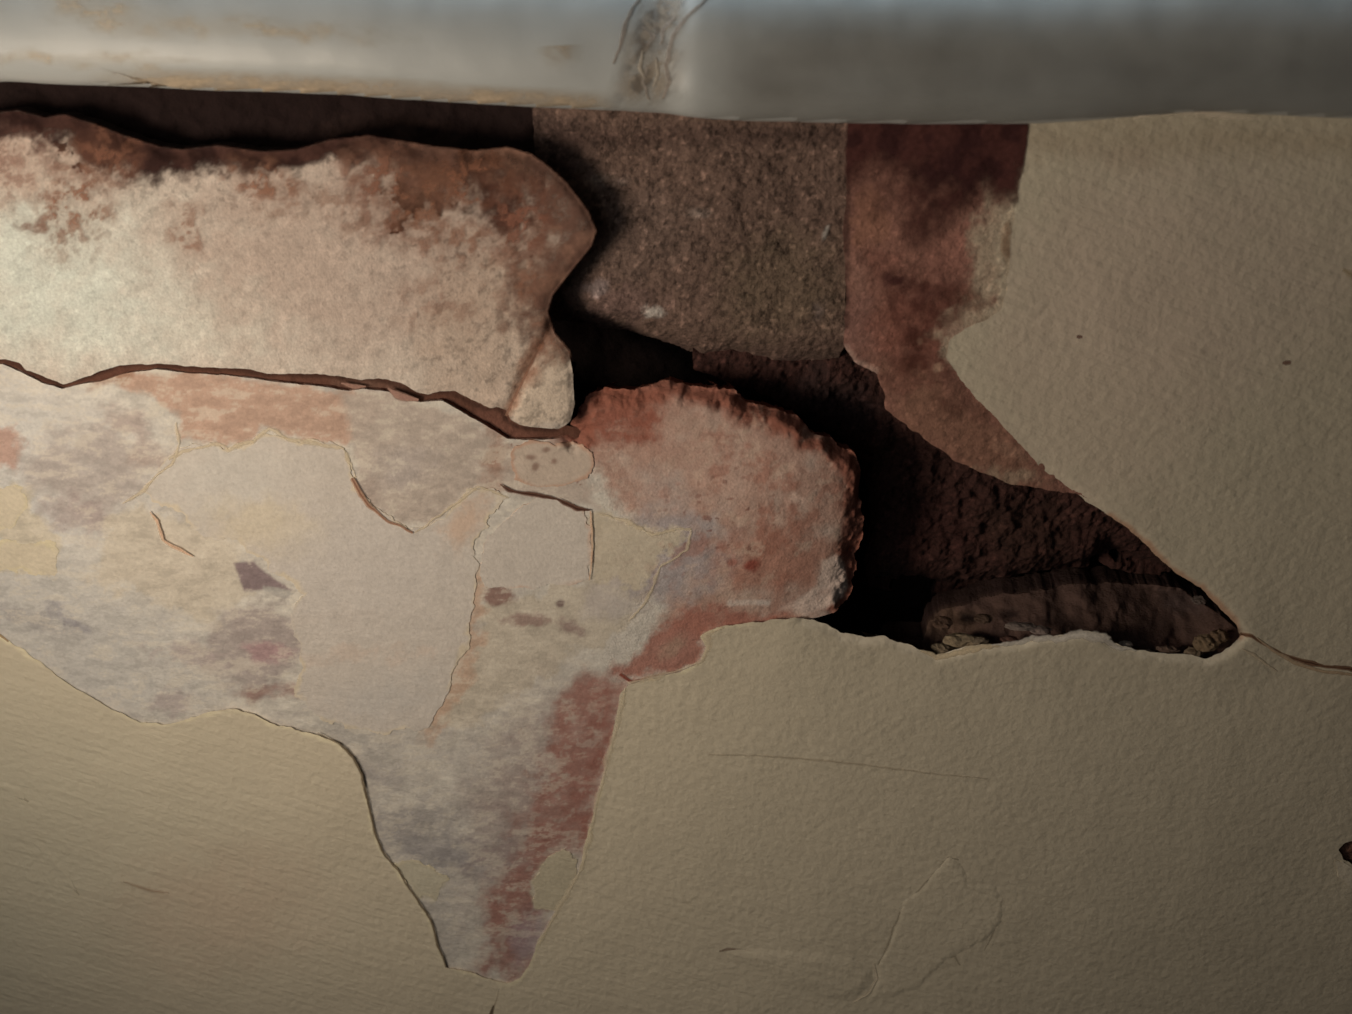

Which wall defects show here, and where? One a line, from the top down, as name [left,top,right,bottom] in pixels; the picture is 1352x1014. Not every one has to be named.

leakage [845,123,1029,233]
leakage [0,111,596,363]
crack [0,359,580,439]
crack [500,484,590,511]
peeling [0,107,1240,983]
crack [1239,633,1352,676]
flaking render [1335,841,1352,888]